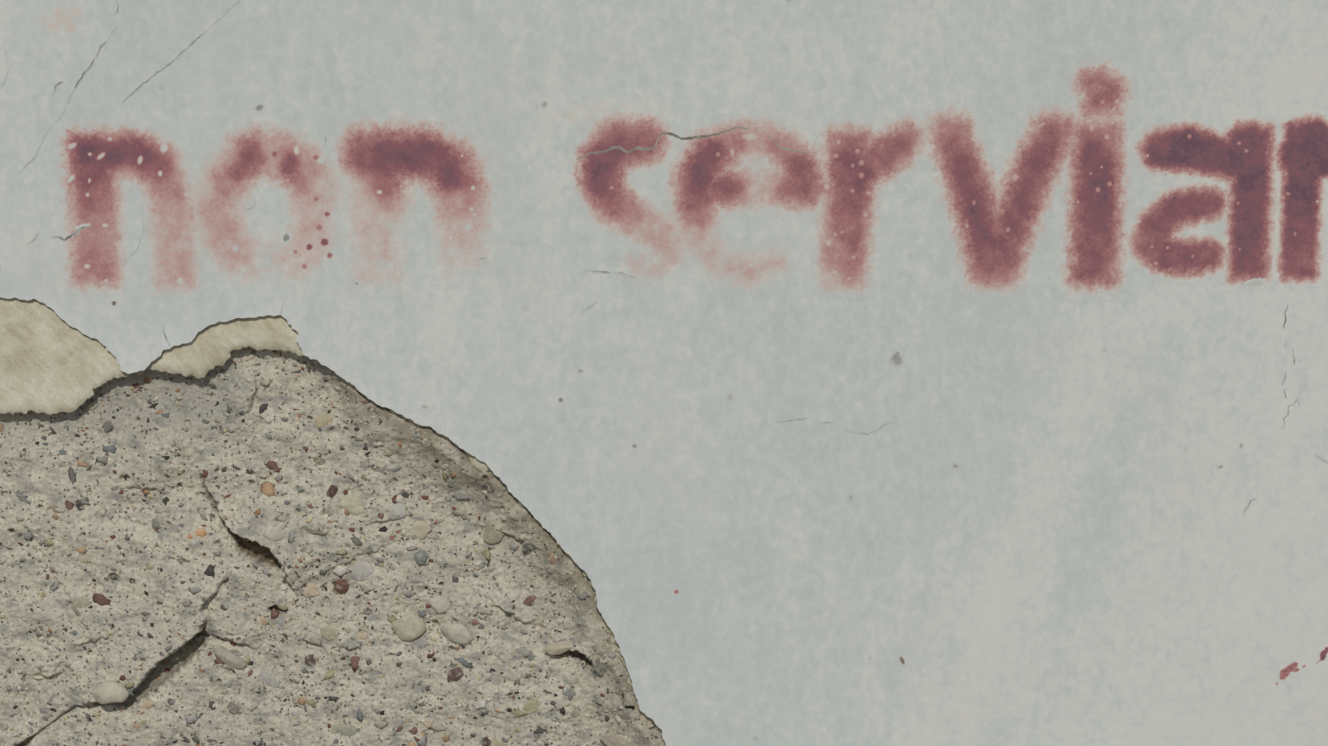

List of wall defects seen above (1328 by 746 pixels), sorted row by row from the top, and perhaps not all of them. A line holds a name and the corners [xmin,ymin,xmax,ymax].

crack [577,126,807,159]
crack [201,474,281,569]
spalling [0,297,665,746]
crack [14,630,209,746]